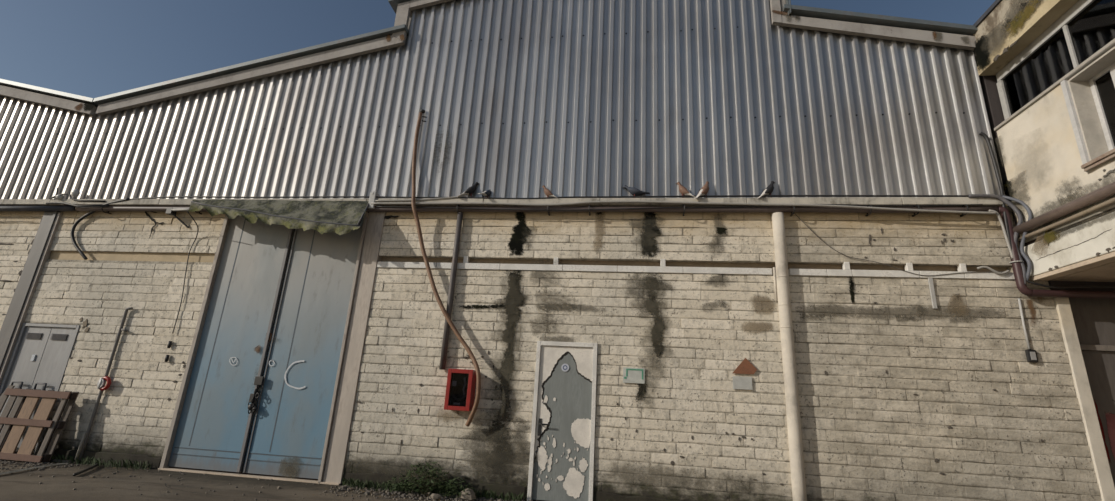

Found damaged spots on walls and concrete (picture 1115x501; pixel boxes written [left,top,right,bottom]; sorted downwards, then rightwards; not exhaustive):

damp [508,212,533,255]
damp [632,212,662,257]
damp [459,270,593,485]
peeling [534,346,593,499]
damp [628,273,668,402]